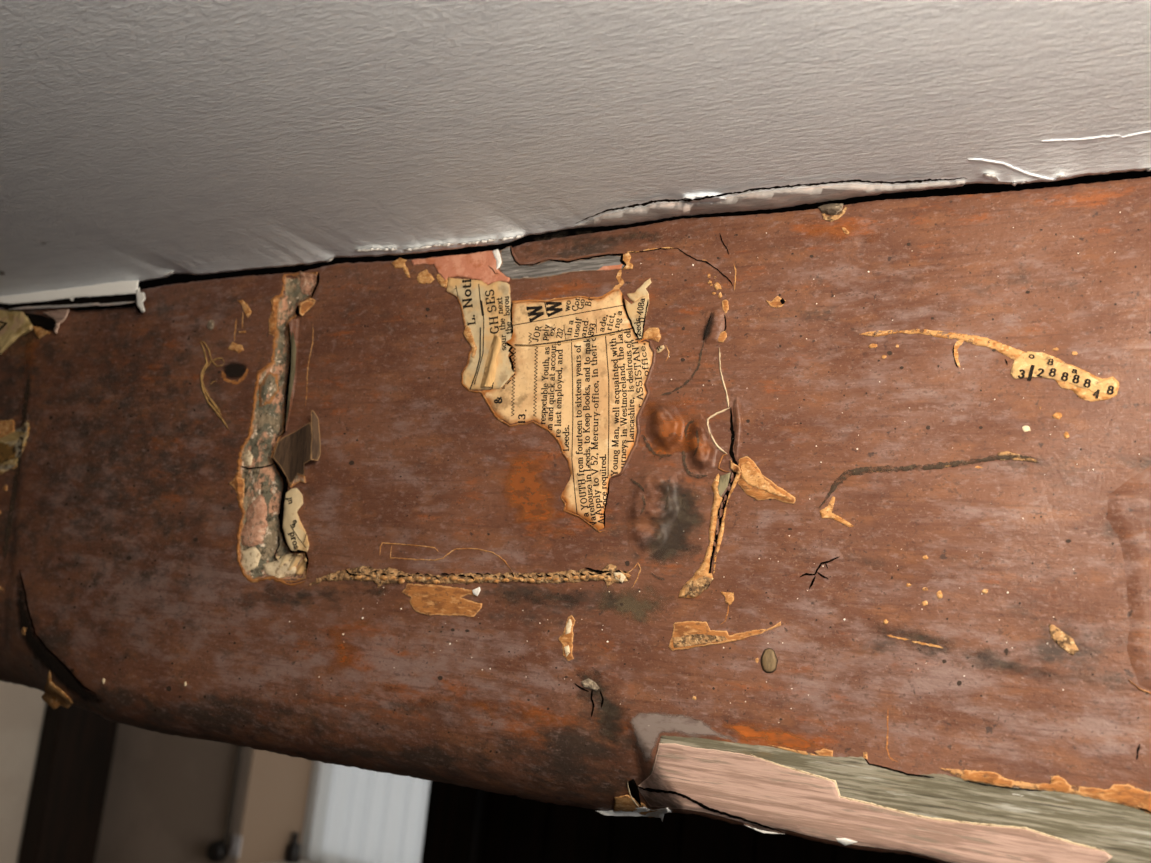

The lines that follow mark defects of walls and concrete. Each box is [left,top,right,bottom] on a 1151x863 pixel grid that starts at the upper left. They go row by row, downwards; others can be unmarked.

peeling [286,298,316,431]
rust [503,456,555,522]
peeling [612,339,657,477]
rust [645,402,710,456]
spalling [738,419,796,504]
crack [819,455,1034,508]
peeling [349,535,641,637]
crack [17,573,102,703]
peeling [663,589,781,658]
rust [728,724,818,749]
spalling [596,779,671,818]